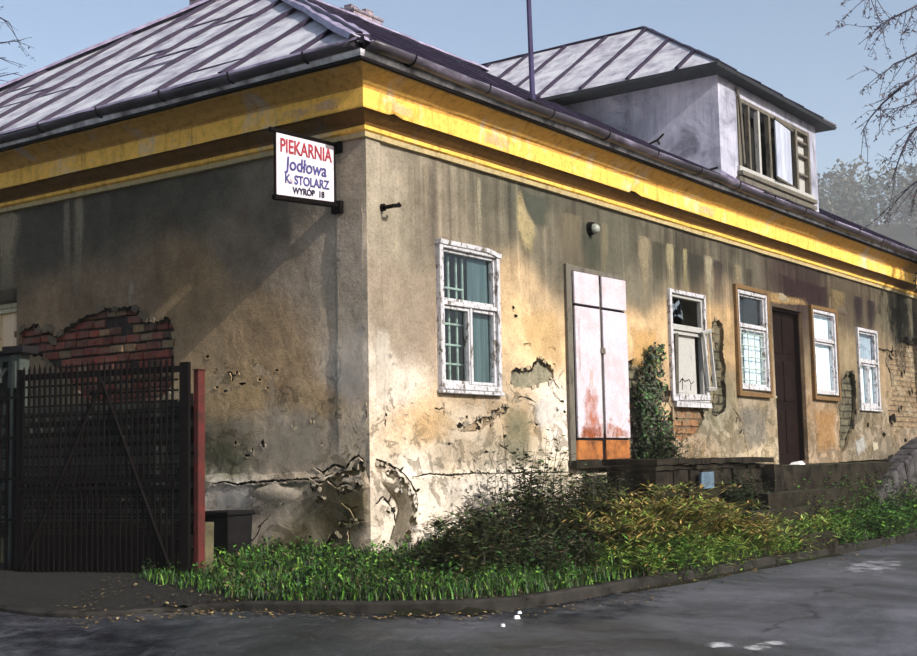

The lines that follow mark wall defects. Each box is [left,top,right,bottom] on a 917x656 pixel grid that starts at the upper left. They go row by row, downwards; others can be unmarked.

leakage [0,212,18,284]
leakage [64,197,83,266]
leakage [639,237,721,292]
leakage [771,276,843,307]
leakage [855,297,874,329]
spalling [14,304,177,404]
spalling [510,356,554,389]
corrosion [584,373,623,437]
spalling [628,316,727,459]
spalling [882,334,917,443]
spalling [310,461,418,544]
crack [211,444,569,553]